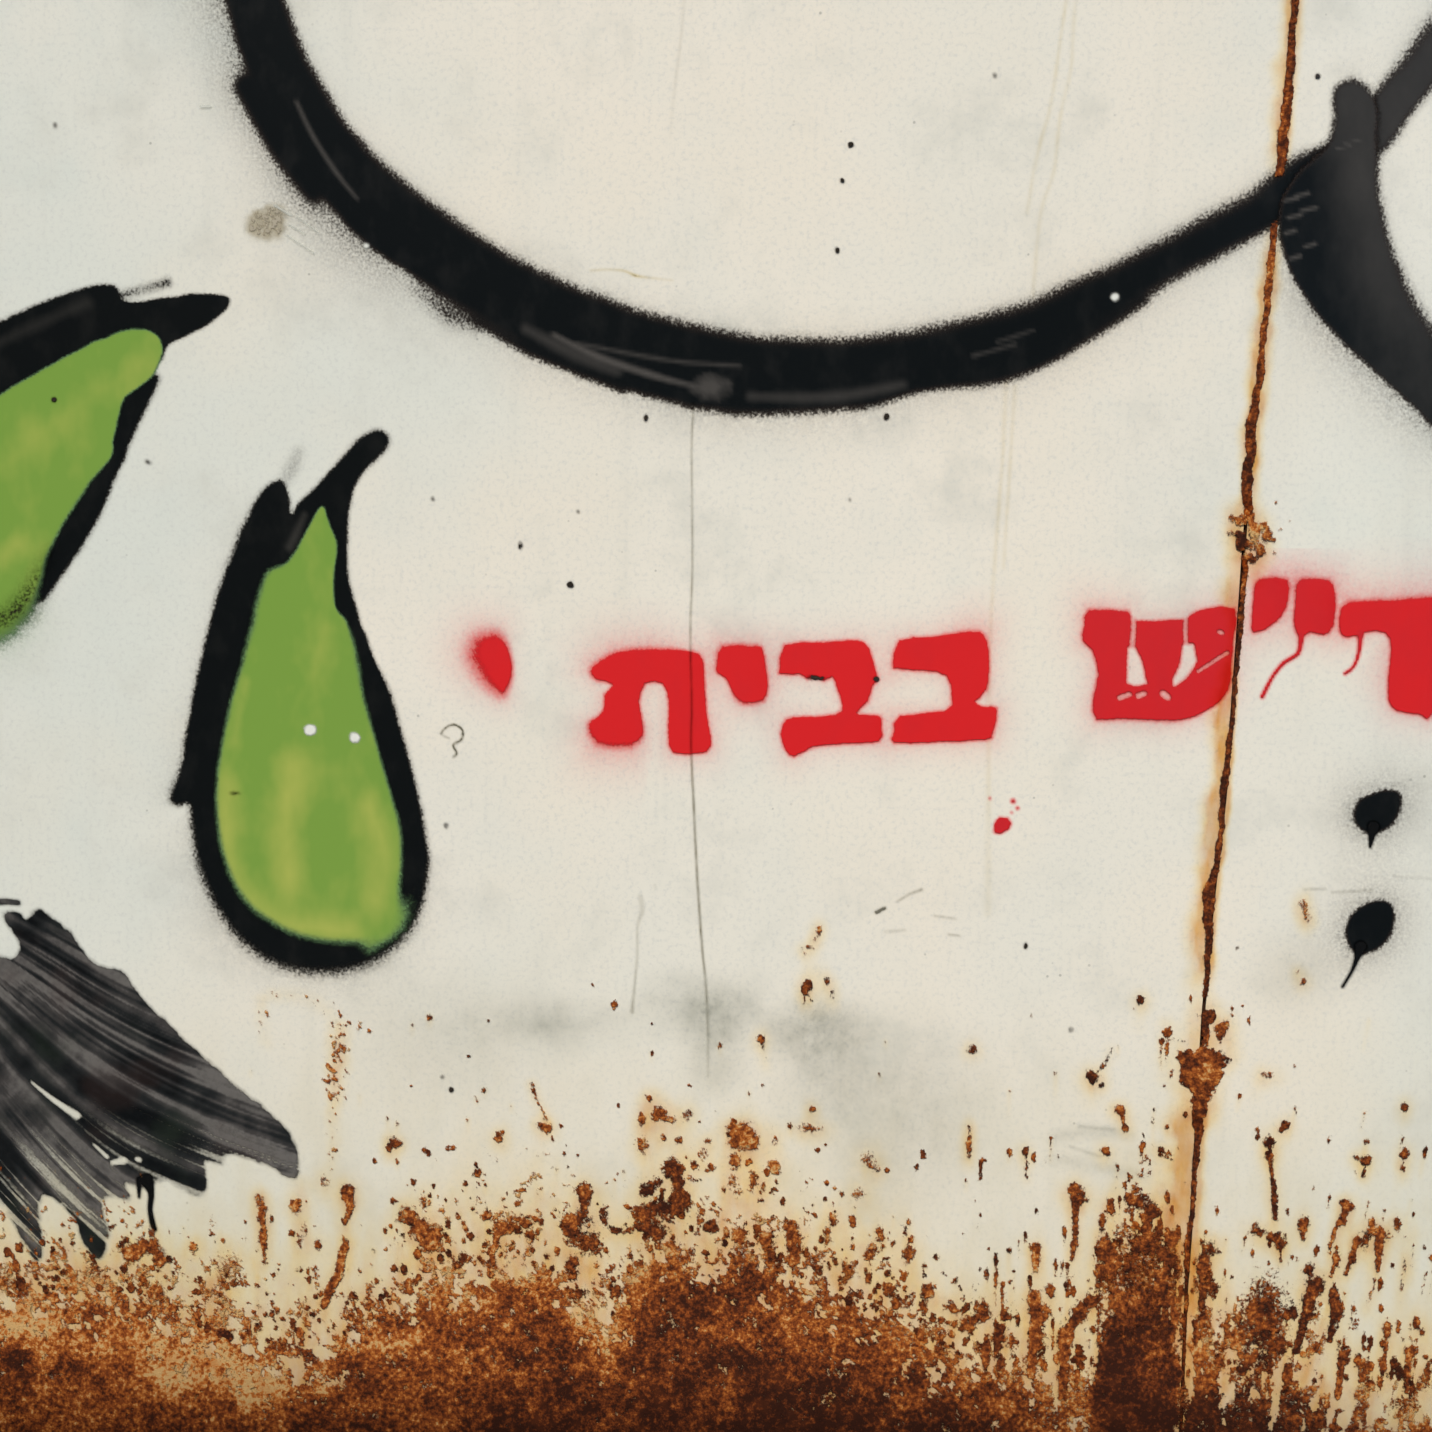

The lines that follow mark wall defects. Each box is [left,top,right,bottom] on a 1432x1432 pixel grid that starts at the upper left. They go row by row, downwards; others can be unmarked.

corrosion [1275,0,1300,177]
corrosion [1189,221,1281,1002]
corrosion [801,977,834,1002]
corrosion [0,991,1432,1432]